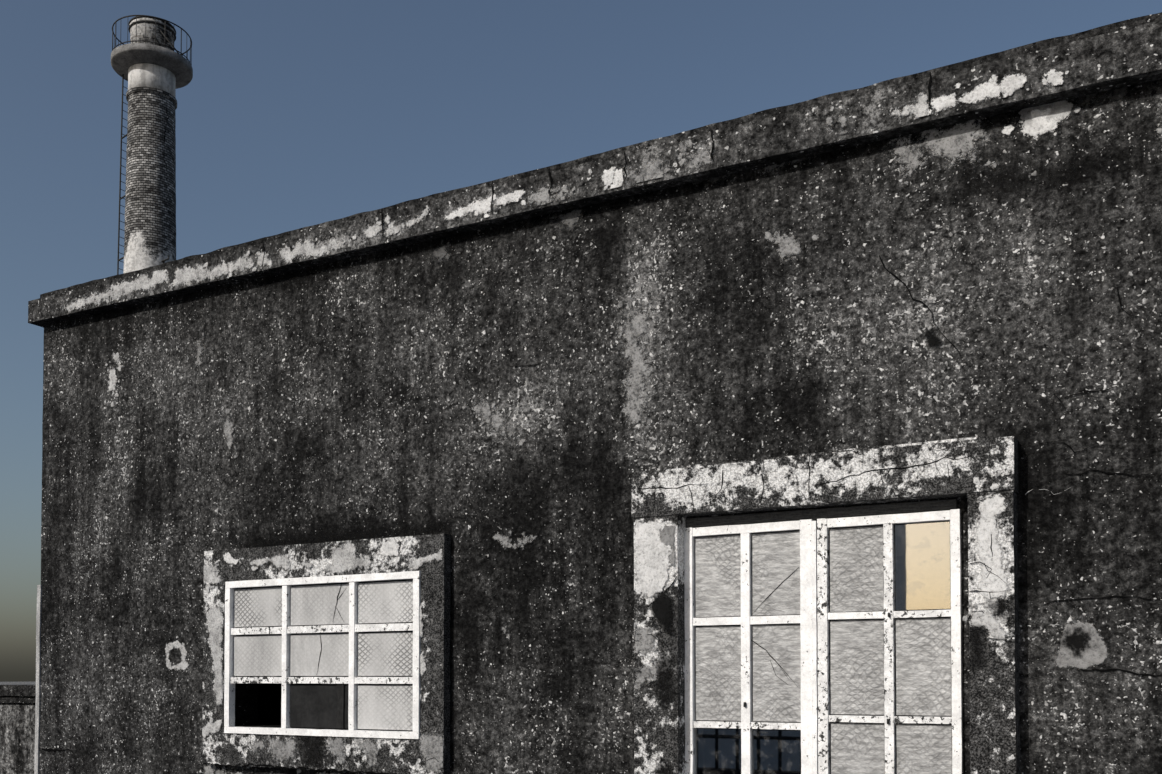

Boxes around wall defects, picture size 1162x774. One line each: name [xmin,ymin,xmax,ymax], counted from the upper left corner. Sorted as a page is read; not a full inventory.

peeling [892,73,1029,118]
peeling [1042,69,1064,86]
spalling [884,100,1081,185]
peeling [444,185,582,229]
peeling [52,205,429,318]
spalling [615,301,654,429]
spalling [165,640,189,670]
peeling [204,538,442,593]
water stain [241,524,452,772]
peeling [634,520,675,691]
peeling [963,477,1013,641]
spalling [1054,621,1109,669]